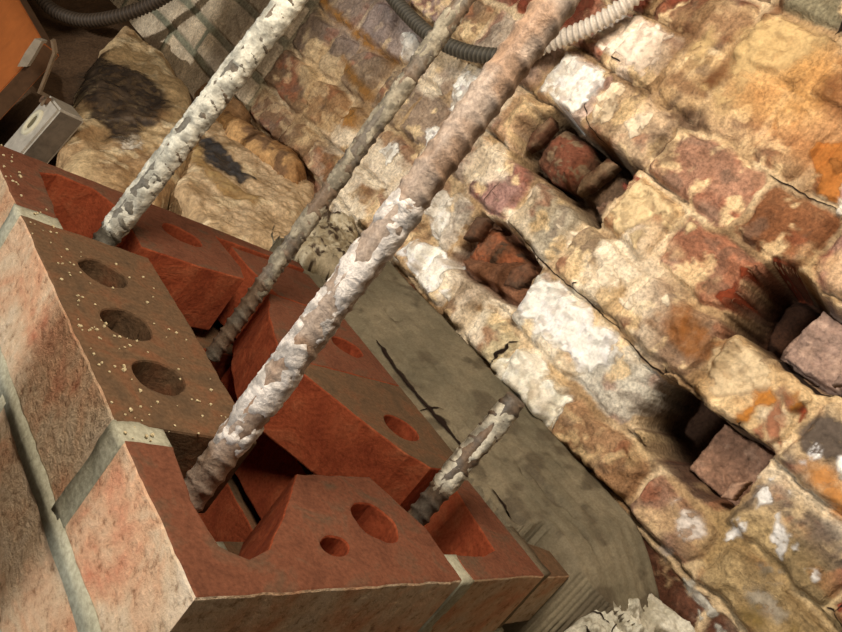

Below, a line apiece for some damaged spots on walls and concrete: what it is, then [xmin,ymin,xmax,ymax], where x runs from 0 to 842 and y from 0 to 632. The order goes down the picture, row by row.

corrosion [810,142,842,203]
crack [768,174,842,216]
corrosion [736,388,776,423]
corrosion [788,395,803,411]
corrosion [812,469,842,514]